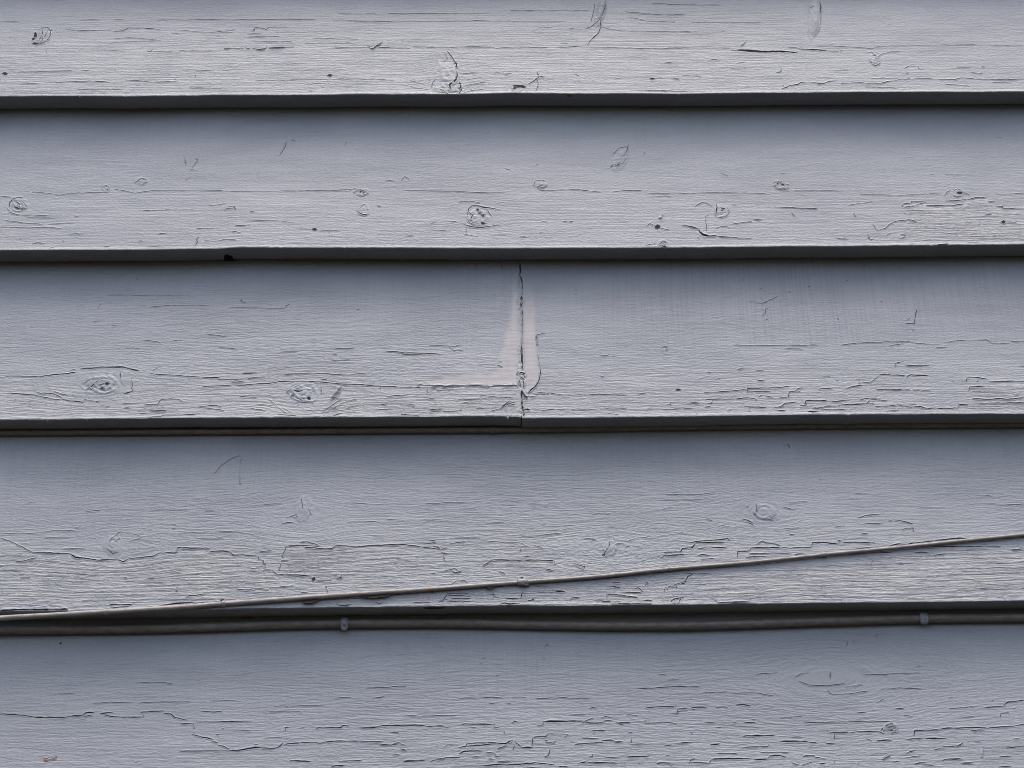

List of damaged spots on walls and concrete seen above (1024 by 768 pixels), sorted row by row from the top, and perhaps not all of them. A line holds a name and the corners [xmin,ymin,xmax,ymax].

crack [0,291,1024,418]
crack [0,498,1024,606]
crack [0,604,68,612]
crack [107,602,133,610]
crack [0,665,1024,768]